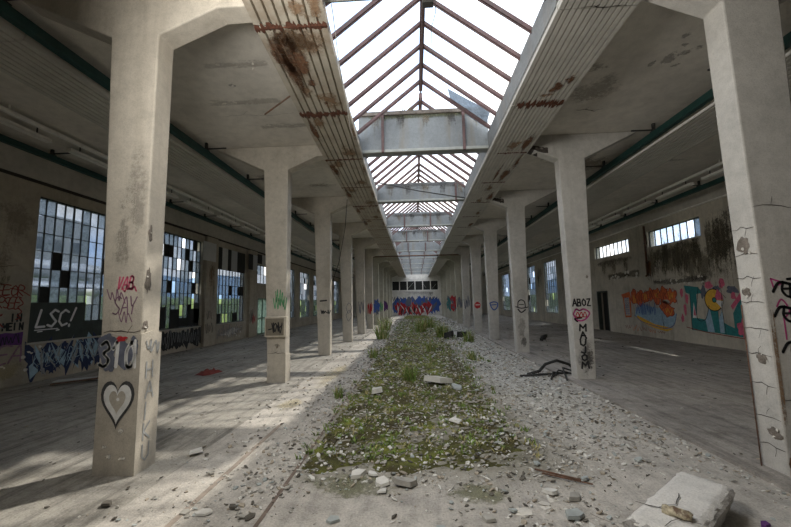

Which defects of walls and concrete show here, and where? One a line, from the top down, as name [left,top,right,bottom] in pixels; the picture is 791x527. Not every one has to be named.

rust [254,0,349,138]
rust [516,76,575,109]
damp [648,210,736,284]
crack [719,276,763,335]